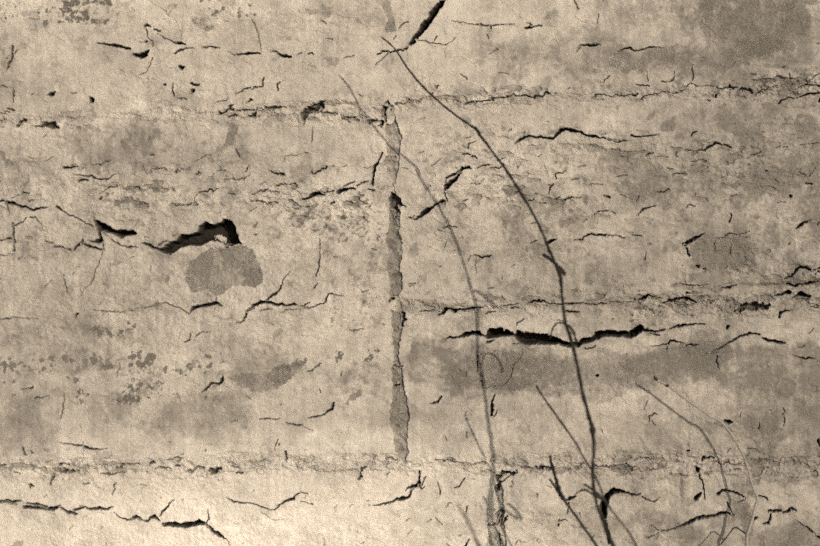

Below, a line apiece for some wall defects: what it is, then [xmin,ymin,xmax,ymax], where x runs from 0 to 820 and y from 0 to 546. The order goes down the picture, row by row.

crack [375,0,542,65]
crack [408,127,732,244]
crack [0,159,223,343]
crack [235,239,344,323]
crack [773,265,820,318]
crack [419,283,820,418]
crack [0,482,230,546]
crack [225,492,314,511]
crack [557,495,577,526]
crack [599,487,660,545]
crack [645,454,820,539]